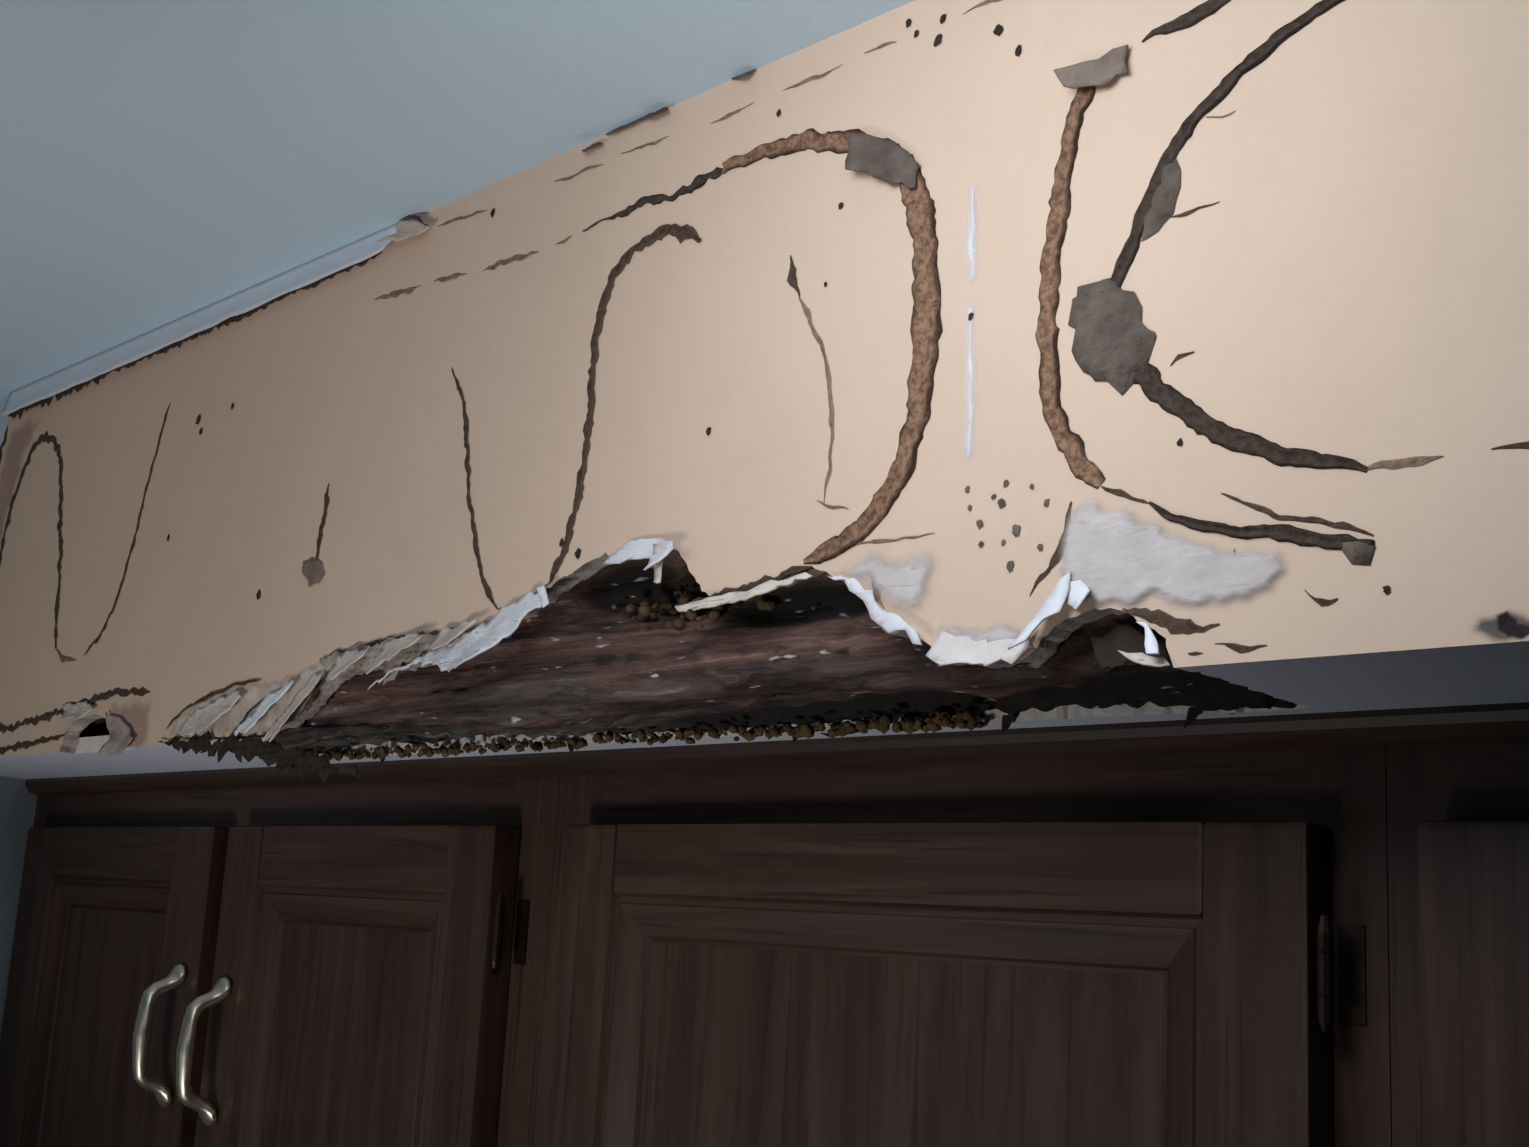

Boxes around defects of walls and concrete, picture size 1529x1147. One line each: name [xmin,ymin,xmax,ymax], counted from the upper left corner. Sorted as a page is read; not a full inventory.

crack [964,0,1002,14]
crack [710,42,895,124]
crack [554,136,668,182]
crack [399,210,487,226]
crack [0,252,382,663]
crack [451,223,701,610]
crack [787,255,934,608]
spalling [965,486,1020,572]
spalling [991,480,1009,508]
spalling [157,503,1297,783]
crack [0,686,150,755]
spalling [60,701,134,757]